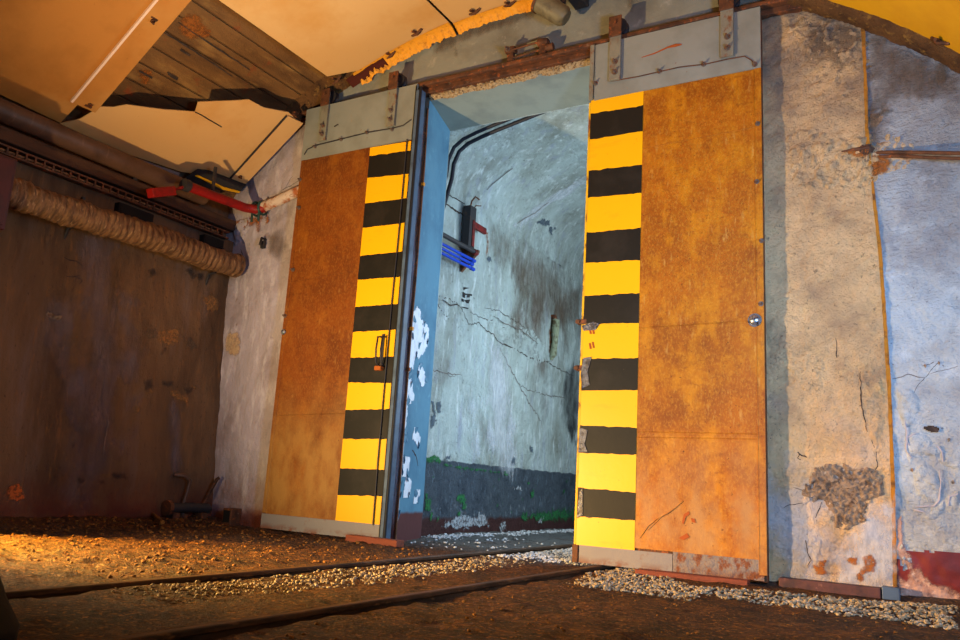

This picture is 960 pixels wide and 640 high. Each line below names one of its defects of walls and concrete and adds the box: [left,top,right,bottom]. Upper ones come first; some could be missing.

spalling [346,58,388,88]
rust [846,144,890,176]
rust [266,147,371,520]
peeling [398,306,439,522]
crack [438,297,570,422]
rust [635,69,759,560]
flaking render [784,363,892,530]
crack [861,28,958,587]
damp [441,512,487,529]
rust [813,560,826,575]
rust [847,555,876,581]